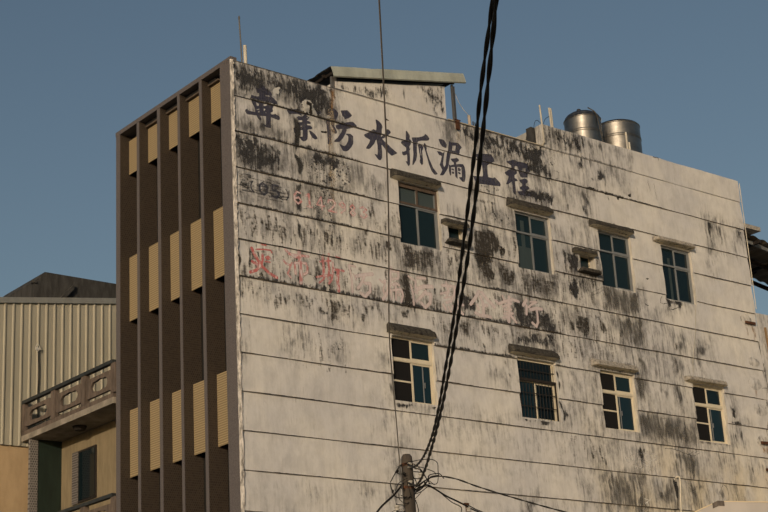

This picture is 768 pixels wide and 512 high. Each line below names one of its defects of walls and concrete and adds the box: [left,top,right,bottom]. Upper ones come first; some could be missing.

leakage [233,64,387,246]
leakage [244,245,561,352]
leakage [639,415,694,443]
leakage [609,475,645,512]
leakage [661,479,679,509]